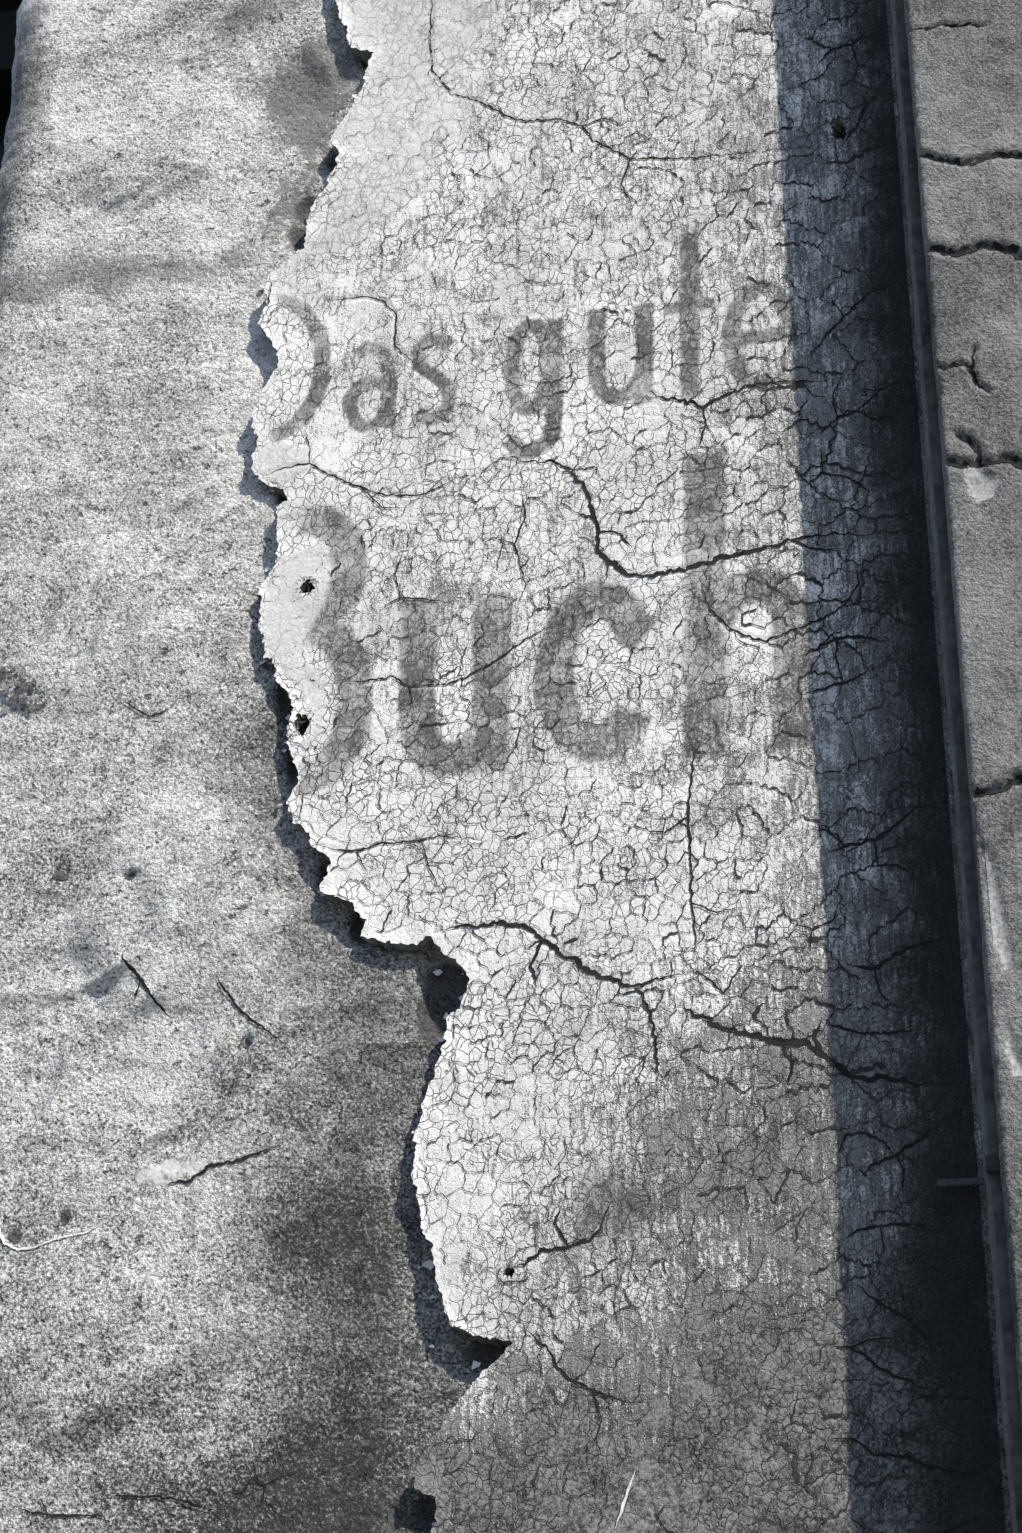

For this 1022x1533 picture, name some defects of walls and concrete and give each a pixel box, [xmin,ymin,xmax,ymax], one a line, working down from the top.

crack [214,972,293,1049]
peeling [0,0,513,1533]
crack [259,0,1022,1533]
spalling [830,120,849,141]